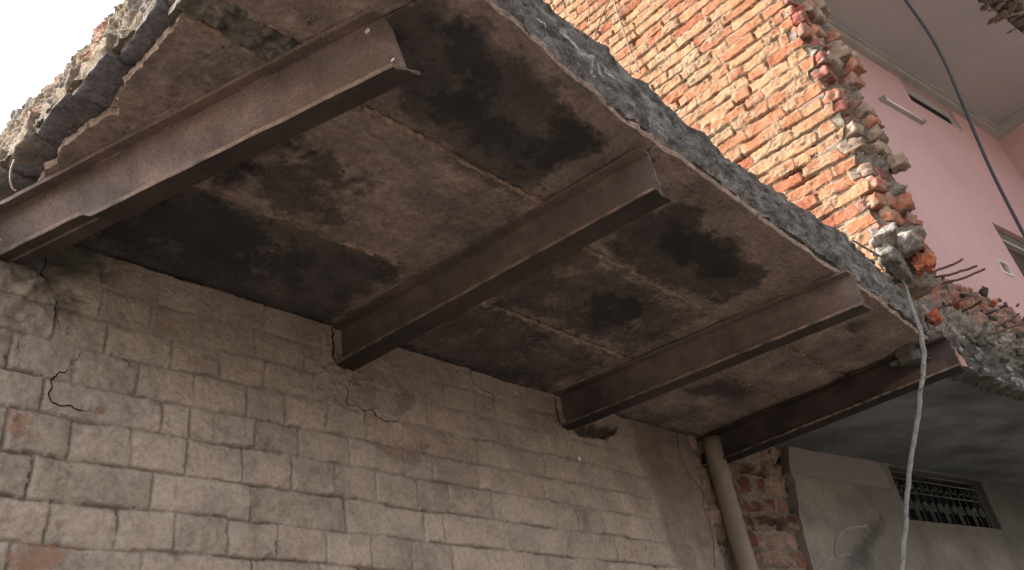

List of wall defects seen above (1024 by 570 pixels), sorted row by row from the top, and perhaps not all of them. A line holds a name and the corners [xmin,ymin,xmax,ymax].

leakage [560,30,614,91]
spalling [978,0,1024,34]
crack [40,257,60,329]
crack [48,352,90,411]
crack [331,328,414,423]
spalling [894,258,1024,401]
flaking render [688,436,737,570]
flaking render [728,446,809,570]